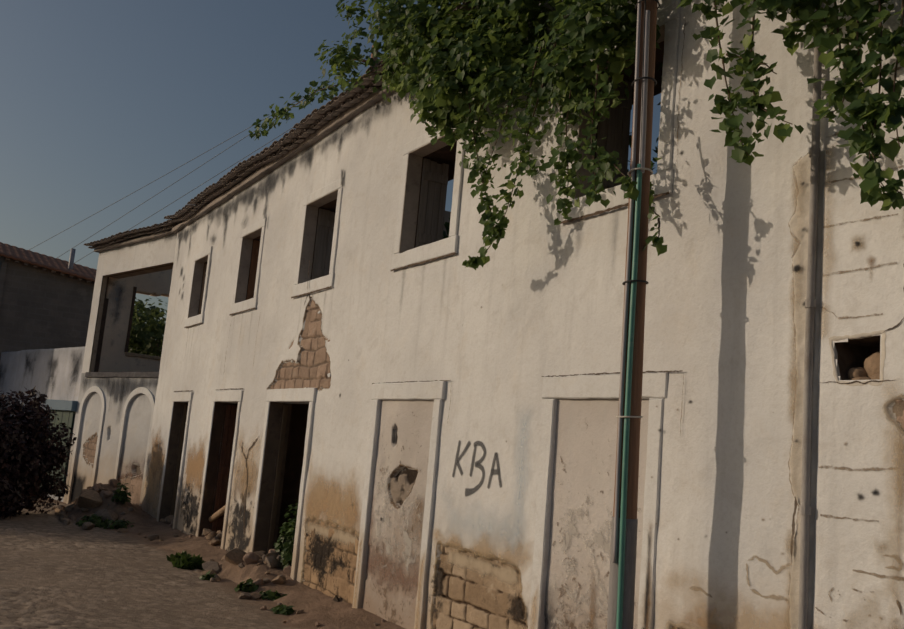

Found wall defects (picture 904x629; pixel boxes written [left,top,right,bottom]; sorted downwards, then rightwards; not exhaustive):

leakage [207,119,353,240]
spalling [267,297,331,391]
crack [820,378,893,386]
spalling [829,330,886,386]
spalling [883,395,904,433]
leakage [180,478,202,535]
leakage [226,441,256,552]
crack [240,436,259,540]
spalling [386,464,418,509]
spalling [300,515,359,605]
spalling [429,541,528,629]
crack [746,556,788,600]